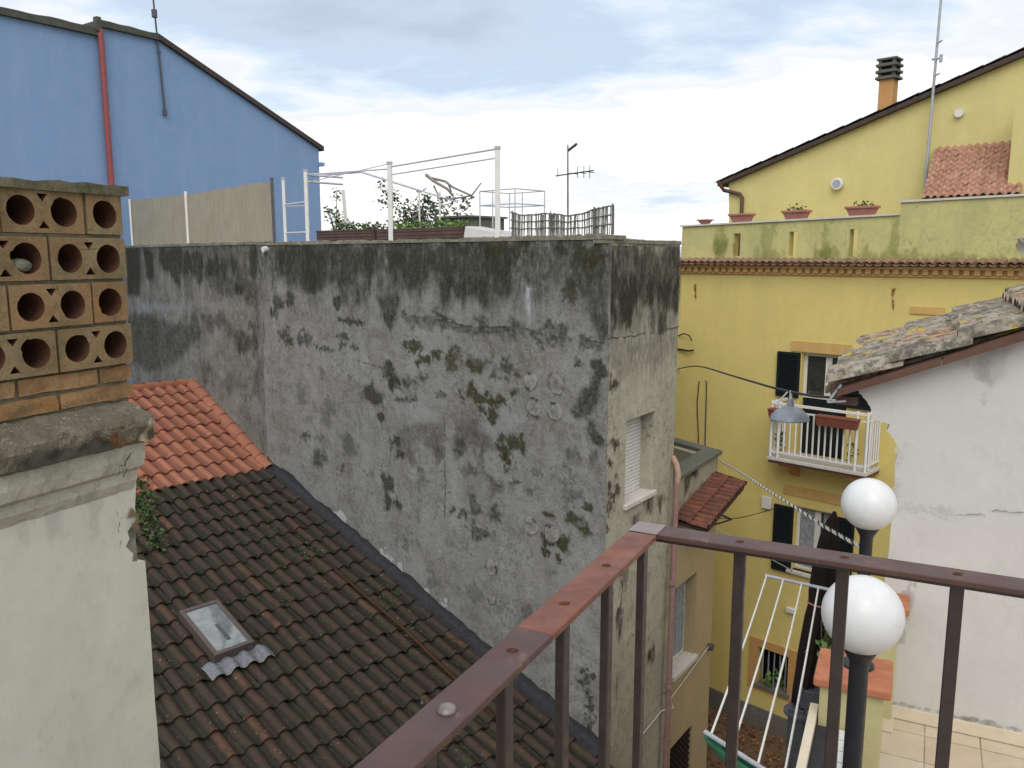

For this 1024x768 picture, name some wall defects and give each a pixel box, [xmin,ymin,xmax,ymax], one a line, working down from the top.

water stain [127,247,257,306]
water stain [270,242,567,352]
crack [404,312,680,344]
water stain [363,359,428,422]
water stain [571,245,681,531]
water stain [19,439,123,472]
water stain [390,426,437,459]
water stain [381,472,402,510]
water stain [450,495,502,541]